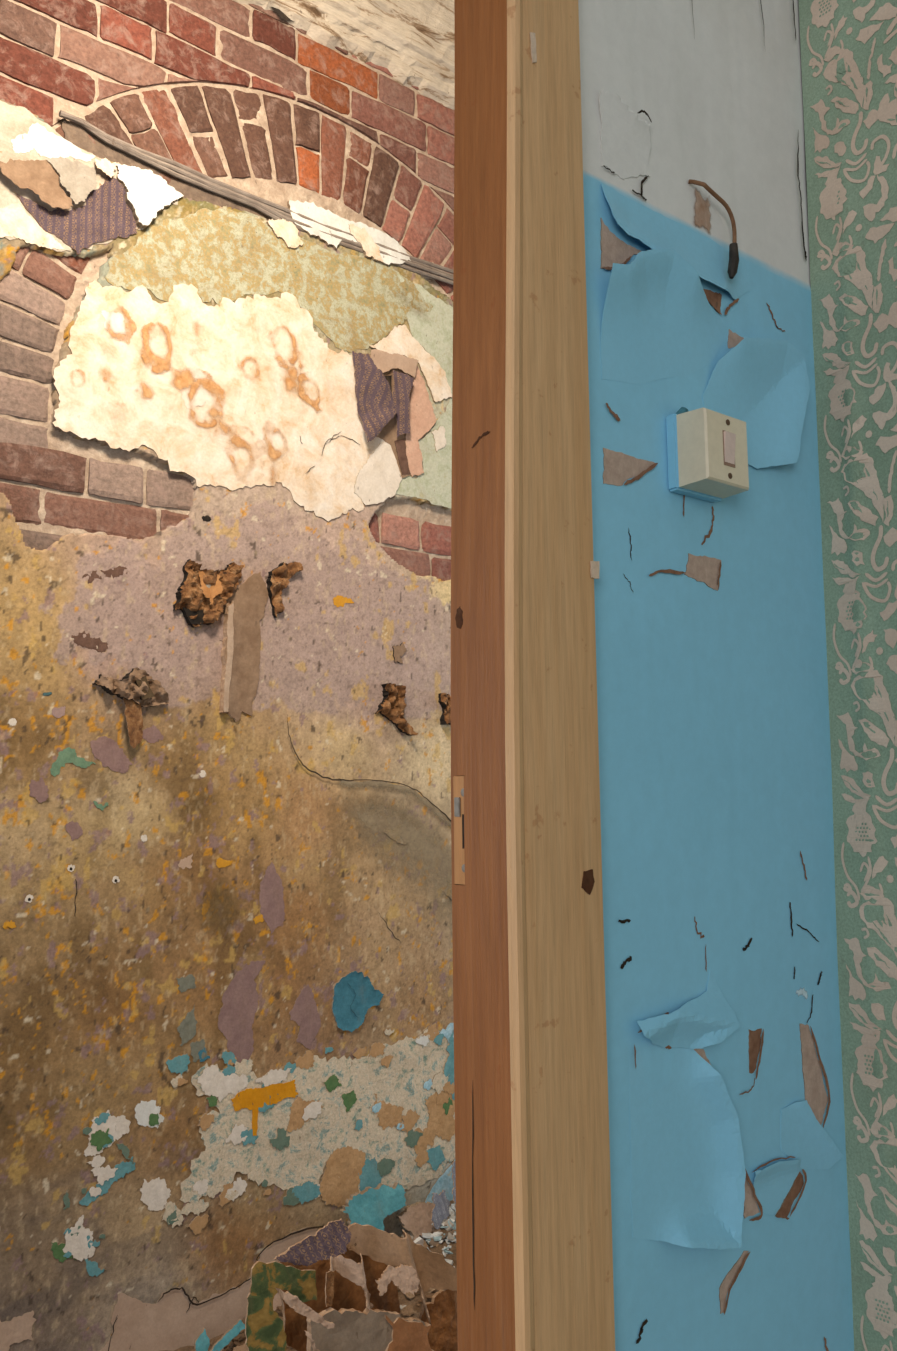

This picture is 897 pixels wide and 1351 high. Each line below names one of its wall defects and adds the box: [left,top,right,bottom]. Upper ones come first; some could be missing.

flaking render [0,0,454,581]
peeling [600,183,810,469]
peeling [603,448,658,486]
spalling [82,565,127,584]
peeling [333,595,354,607]
crack [287,715,451,821]
peeling [51,960,455,1277]
peeling [629,969,843,1315]
peeling [100,1277,251,1351]